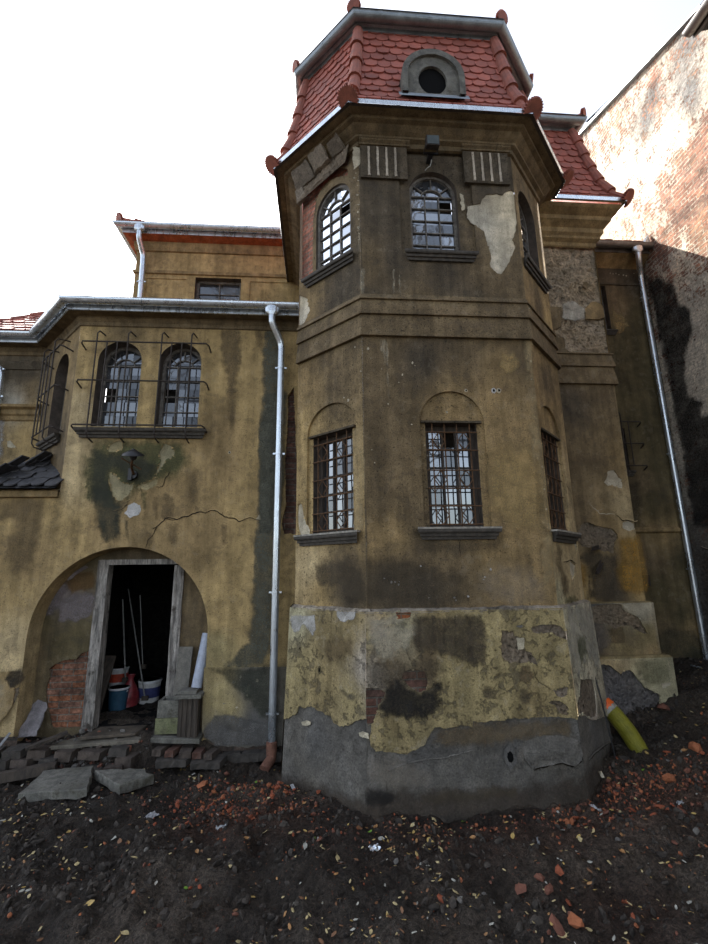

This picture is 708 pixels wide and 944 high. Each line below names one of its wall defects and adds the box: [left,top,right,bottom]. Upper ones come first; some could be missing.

peeling [460,189,517,274]
peeling [537,217,608,353]
water stain [648,278,708,527]
water stain [93,488,127,540]
crack [146,509,260,546]
flaking render [570,503,635,580]
flaking render [501,624,567,665]
flaking render [591,604,648,634]
flaking render [44,651,89,728]
flaking render [281,664,662,823]